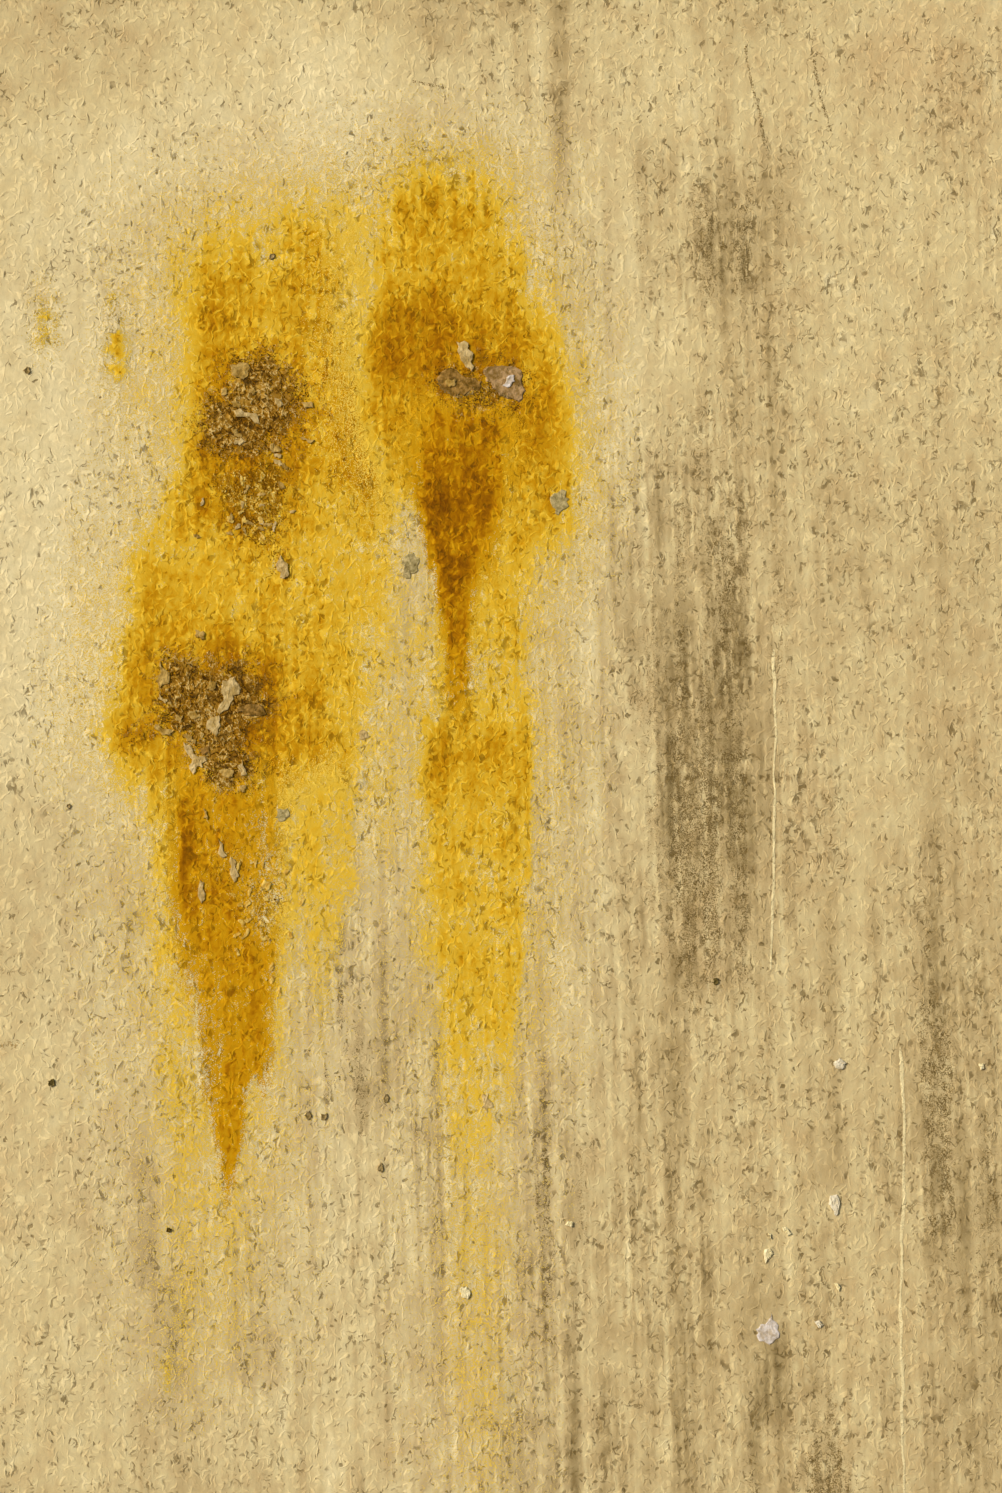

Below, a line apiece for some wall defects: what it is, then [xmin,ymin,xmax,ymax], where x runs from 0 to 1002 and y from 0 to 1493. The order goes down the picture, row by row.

corrosion [21,84,641,1493]
damp [601,134,816,1069]